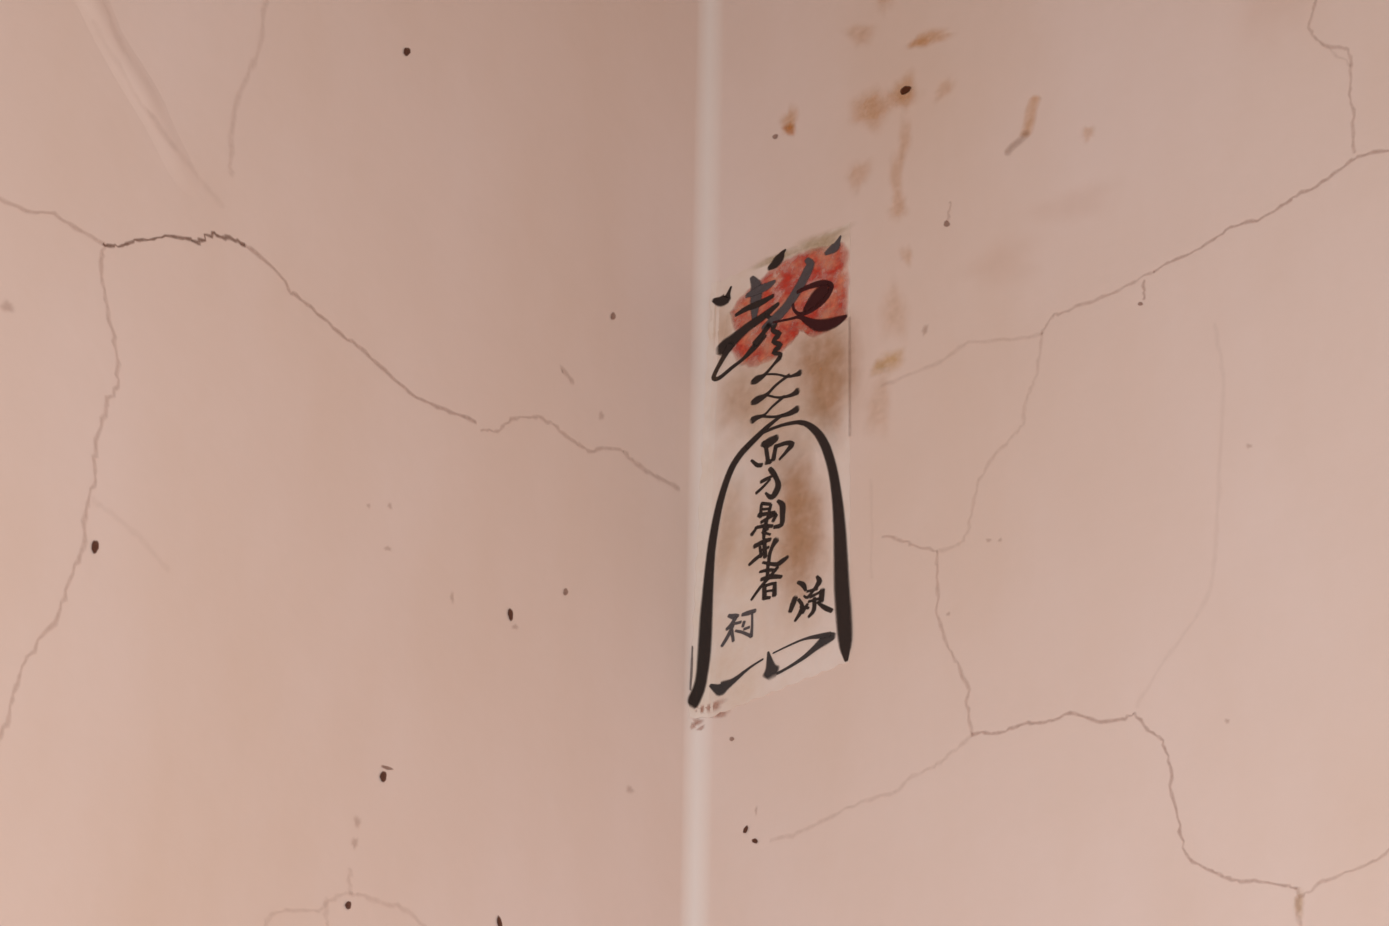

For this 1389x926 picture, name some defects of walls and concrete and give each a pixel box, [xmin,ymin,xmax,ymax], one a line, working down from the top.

crack [103,232,245,247]